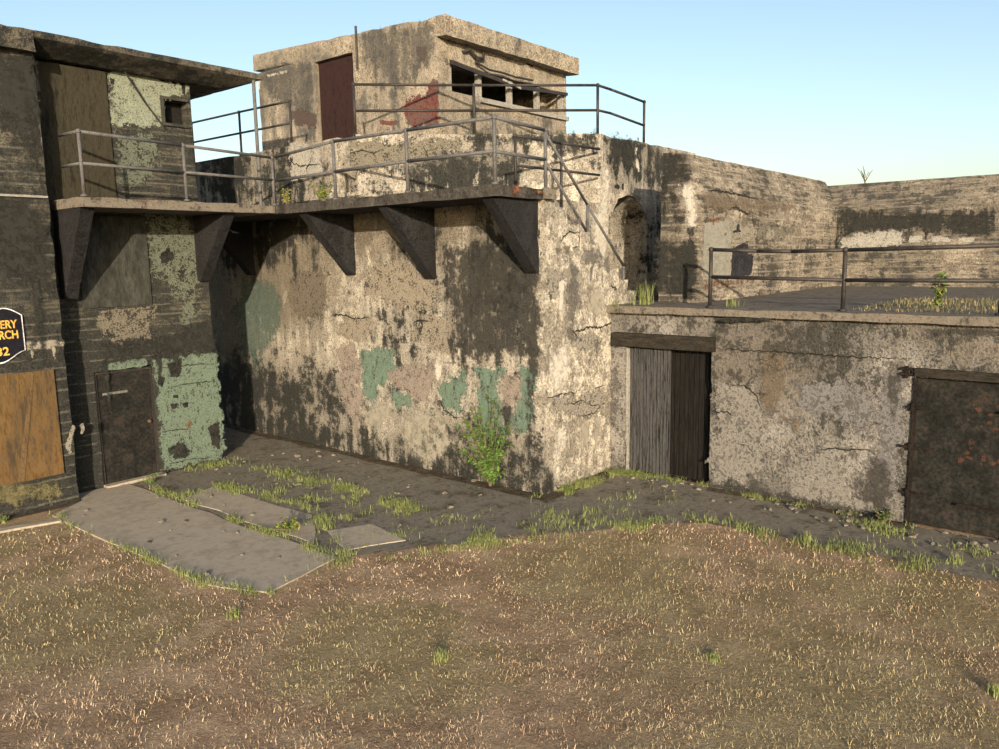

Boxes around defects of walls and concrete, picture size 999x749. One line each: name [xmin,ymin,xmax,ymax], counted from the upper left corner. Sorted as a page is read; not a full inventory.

peeling [107,71,190,189]
spalling [90,304,159,345]
peeling [141,213,202,326]
leakage [234,279,282,371]
leakage [435,130,641,465]
leakage [653,150,796,300]
peeling [107,352,227,472]
leakage [359,404,390,438]
leakage [402,409,454,469]
leakage [550,423,567,480]
spalling [547,385,605,421]
crack [548,385,605,417]